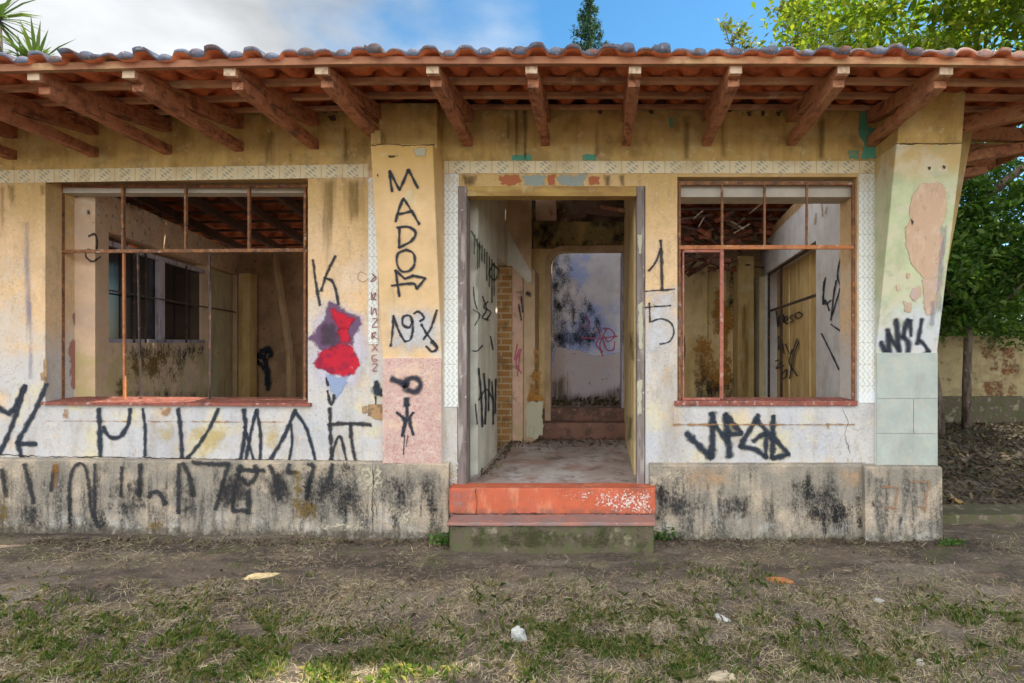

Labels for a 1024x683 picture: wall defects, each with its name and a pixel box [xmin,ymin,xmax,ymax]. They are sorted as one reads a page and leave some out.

peeling [523,174,586,186]
peeling [896,182,947,315]
leakage [17,503,44,530]
leakage [89,479,145,530]
leakage [214,473,247,508]
leakage [265,462,358,523]
leakage [383,477,408,529]
leakage [657,484,705,520]
leakage [719,494,751,518]
leakage [788,477,875,531]